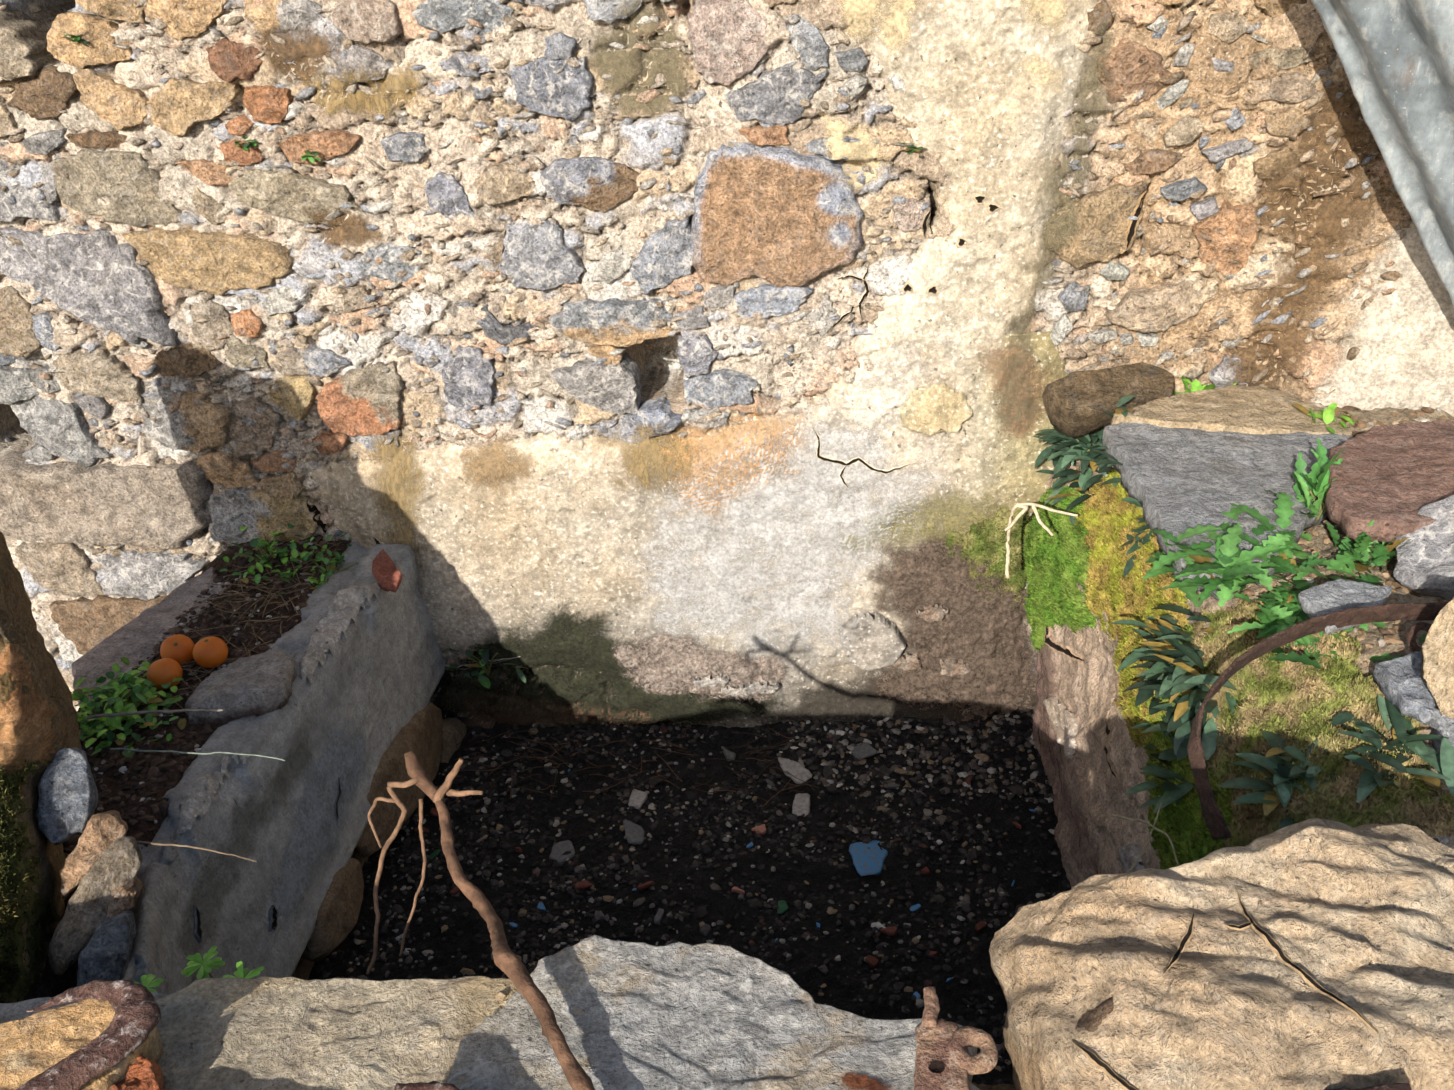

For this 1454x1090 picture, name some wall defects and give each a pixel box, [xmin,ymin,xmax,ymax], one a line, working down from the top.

crack [810,422,916,488]
leakage [434,691,654,729]